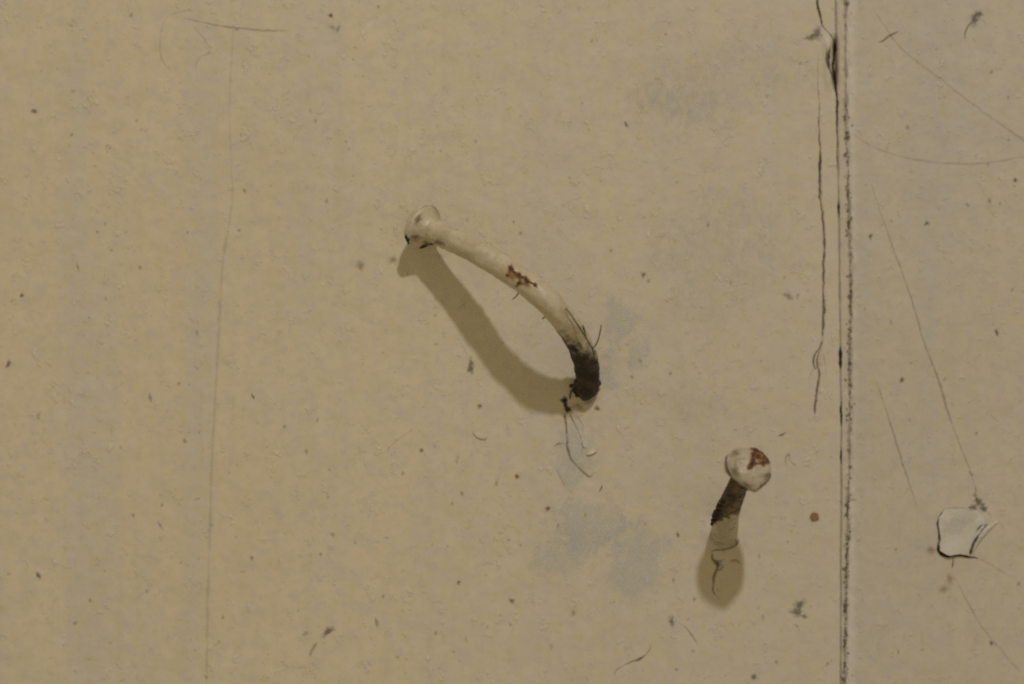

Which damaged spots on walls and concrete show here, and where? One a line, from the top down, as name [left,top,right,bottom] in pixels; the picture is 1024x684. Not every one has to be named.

crack [810,0,842,425]
rust [506,264,537,287]
rust [747,448,770,470]
peeling [937,498,998,567]